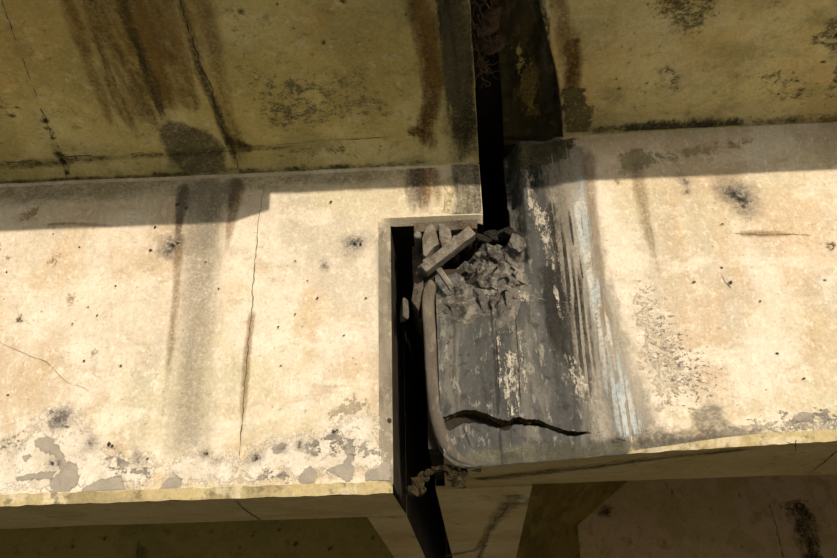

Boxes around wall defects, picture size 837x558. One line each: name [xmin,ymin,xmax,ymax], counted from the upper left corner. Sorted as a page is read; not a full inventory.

crack [0,1,105,178]
leakage [84,0,383,210]
rust [408,0,442,146]
rust [552,0,594,133]
leakage [0,171,217,396]
peeling [0,395,392,494]
crack [239,182,265,455]
spalling [438,244,534,417]
crack [443,410,640,448]
peeling [524,169,564,320]
leakage [466,138,759,480]
peeling [623,270,733,415]